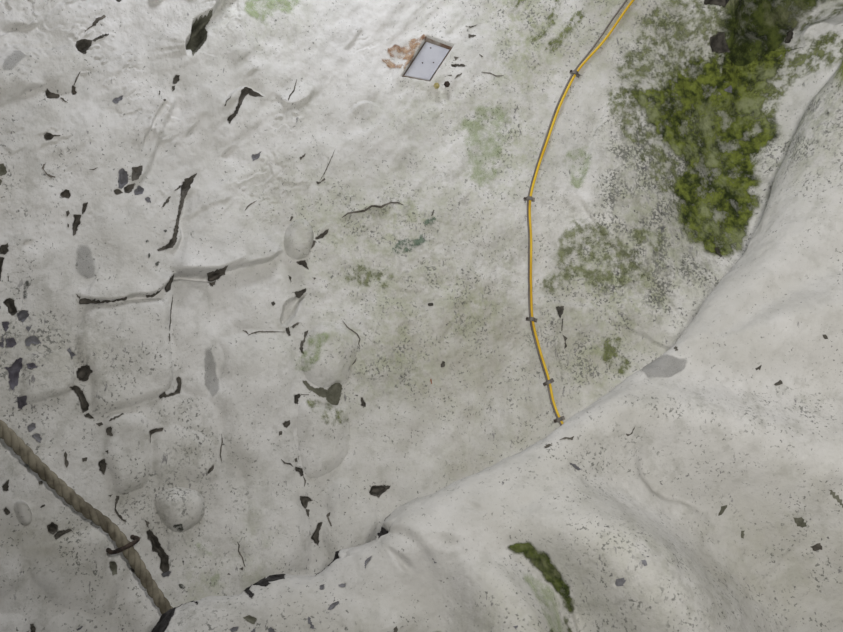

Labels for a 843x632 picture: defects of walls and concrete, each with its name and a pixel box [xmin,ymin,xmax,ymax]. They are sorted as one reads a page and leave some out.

corrosion [382,34,427,68]
spalling [4,358,38,409]
spalling [151,601,198,632]